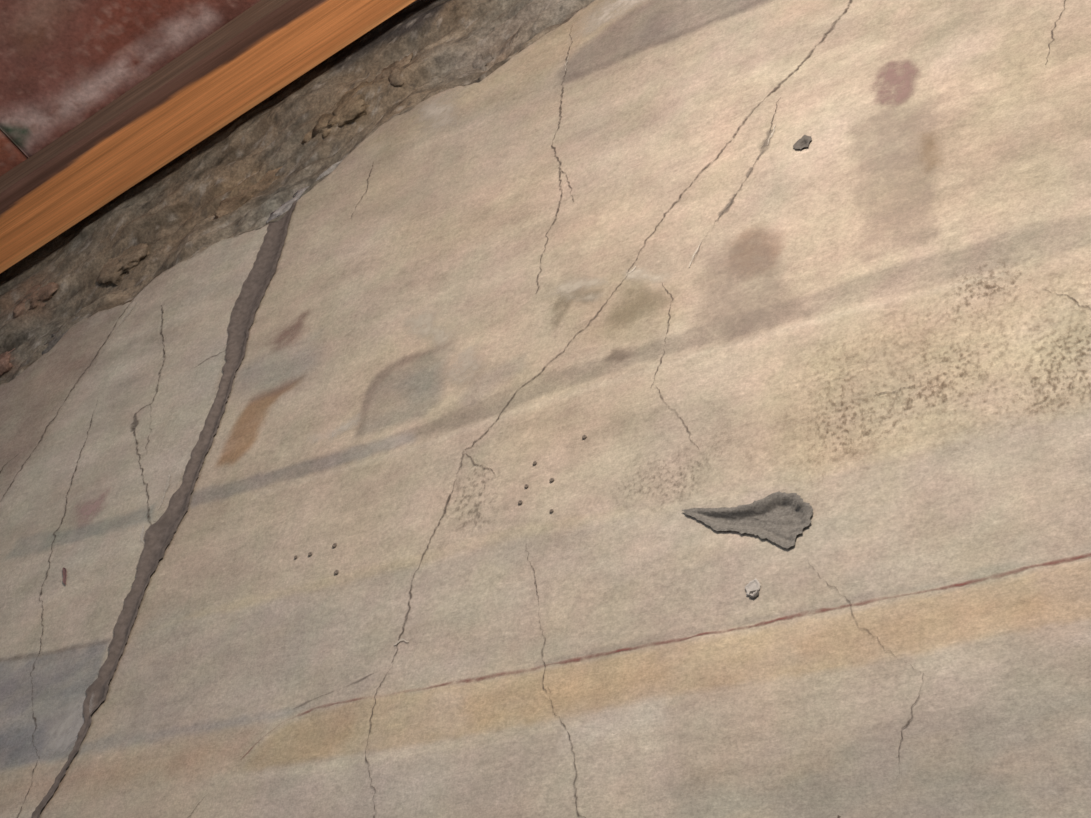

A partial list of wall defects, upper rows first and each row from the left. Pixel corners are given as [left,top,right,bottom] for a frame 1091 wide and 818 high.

crack [467,0,852,473]
damp [878,62,917,103]
crack [17,200,297,818]
crack [365,491,453,818]
spalling [682,491,813,548]